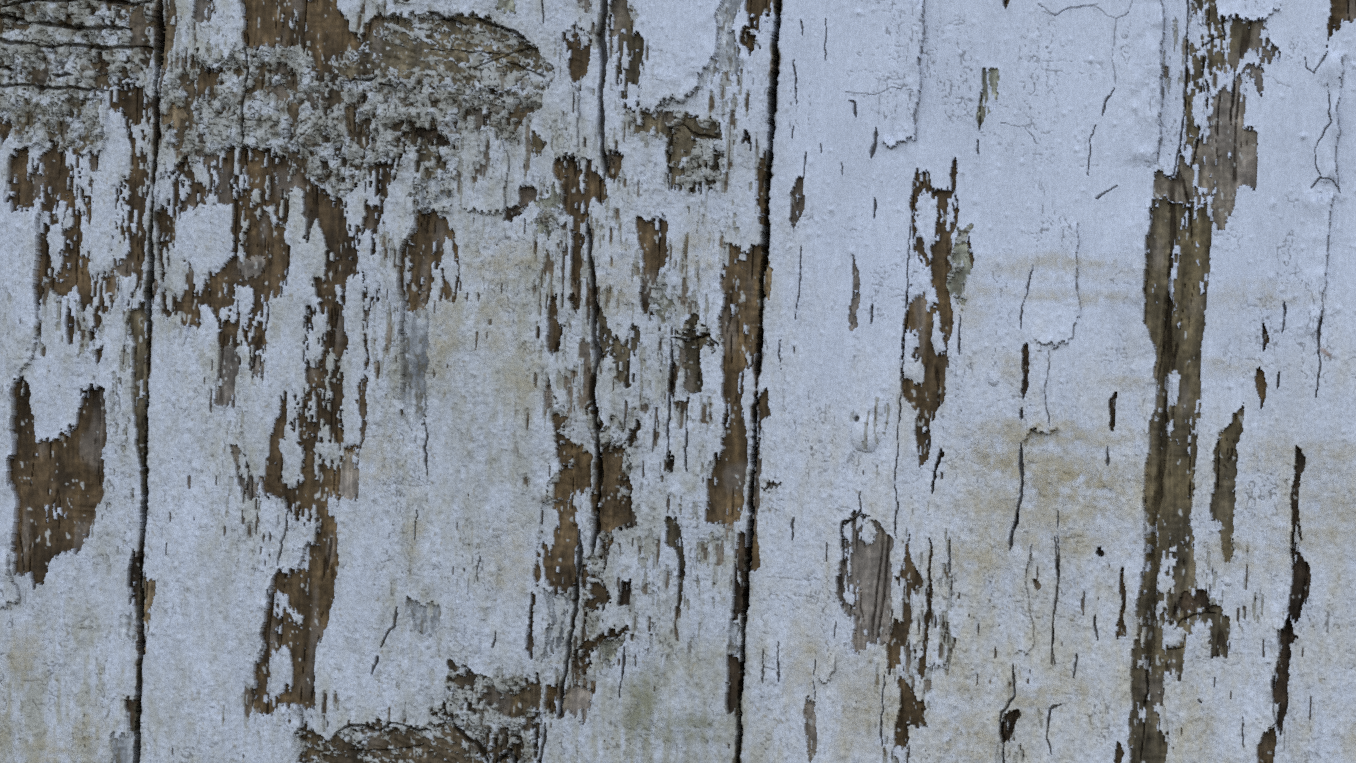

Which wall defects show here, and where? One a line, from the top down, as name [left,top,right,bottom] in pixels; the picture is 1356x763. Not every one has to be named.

peeling [609,0,771,193]
crack [1304,51,1340,193]
peeling [1328,0,1356,37]
peeling [0,0,641,763]
peeling [638,218,779,716]
peeling [904,160,974,484]
crack [1019,265,1034,330]
crack [1008,351,1051,550]
peeling [1112,0,1282,763]
peeling [838,513,949,763]
crack [998,664,1017,763]
crack [1046,511,1099,754]